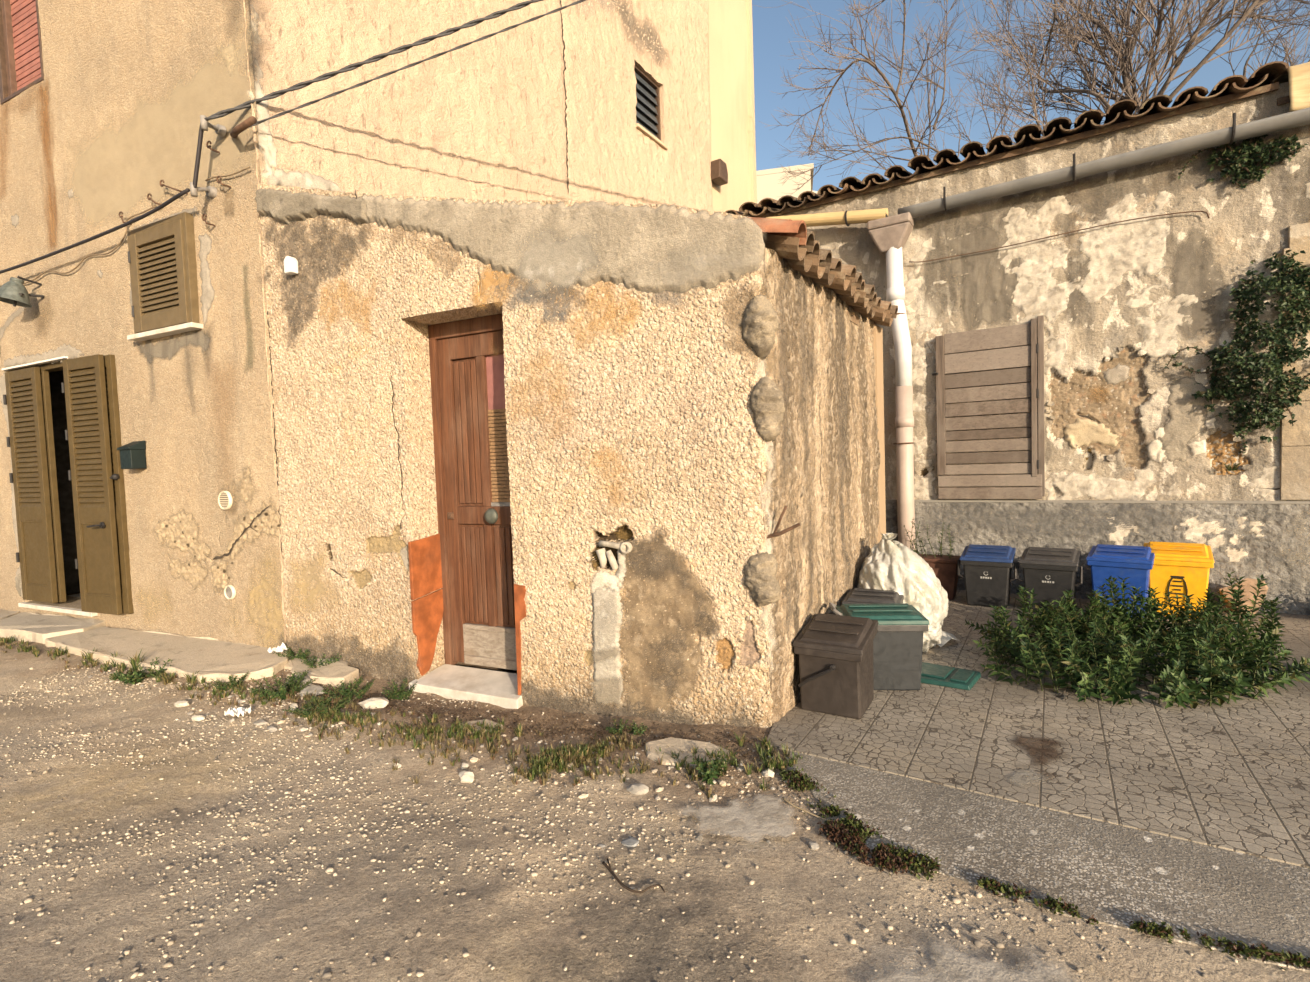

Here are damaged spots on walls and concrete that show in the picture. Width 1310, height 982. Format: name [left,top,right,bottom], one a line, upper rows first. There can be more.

crack [560,0,569,193]
corrosion [40,86,56,246]
leakage [265,217,365,334]
peeling [998,187,1198,501]
crack [207,309,283,561]
flaking render [1188,417,1286,501]
flaking render [155,468,281,593]
flaking render [349,569,373,593]
flaking render [365,525,409,574]
spalling [591,525,634,588]
leakage [517,534,717,725]